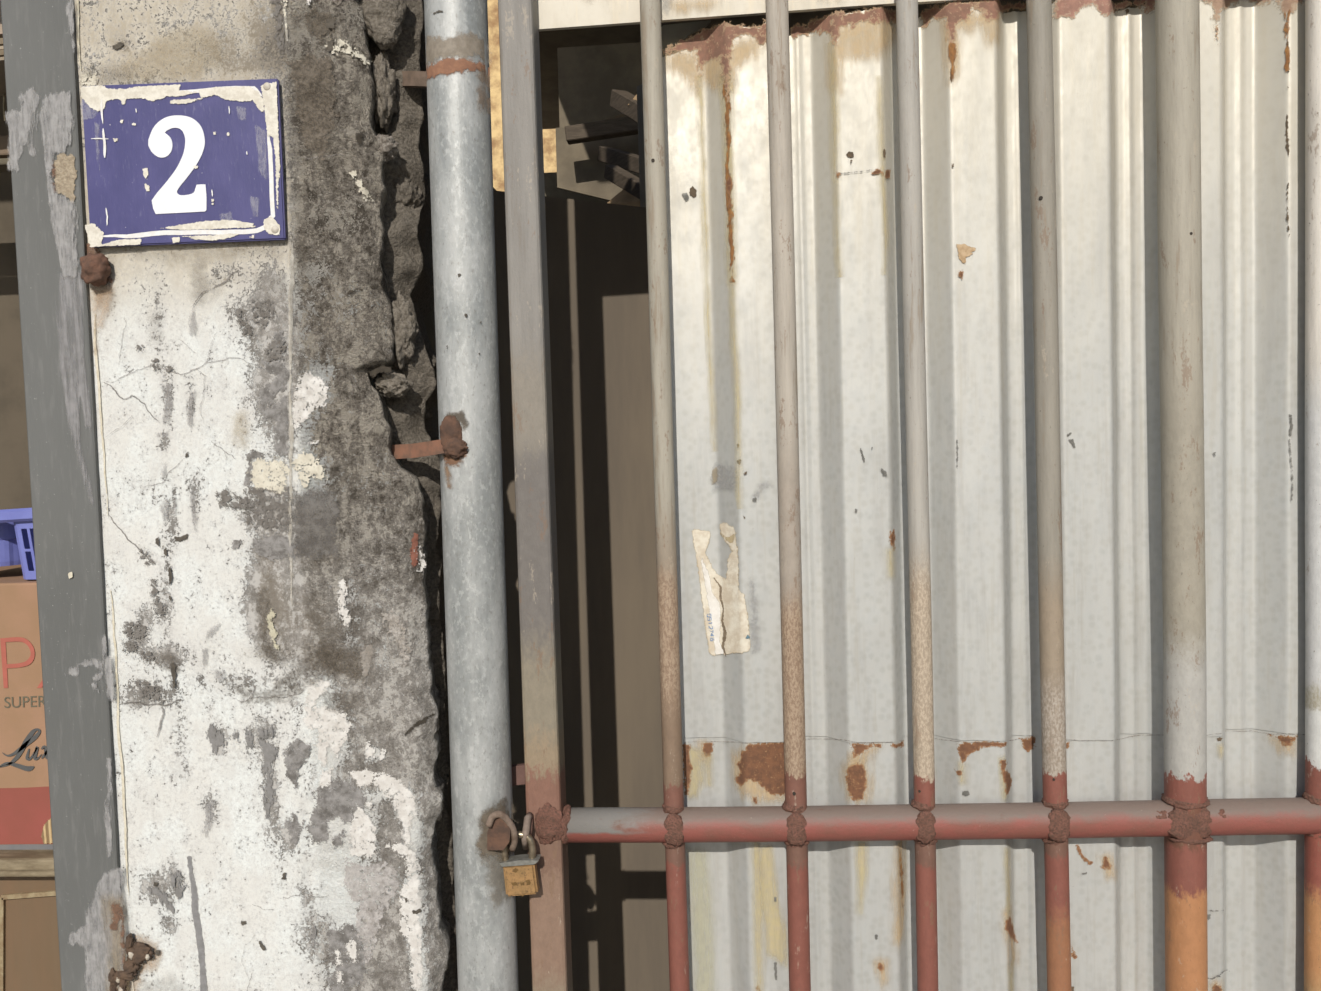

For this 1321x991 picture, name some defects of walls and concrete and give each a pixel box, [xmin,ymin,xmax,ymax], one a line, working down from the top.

rust [1052,0,1155,19]
rust [790,5,896,81]
rust [662,19,767,283]
peeling [155,534,188,556]
flaking render [410,533,426,572]
spalling [336,579,351,627]
spalling [382,610,412,667]
rust [734,742,785,804]
rust [845,740,904,801]
rust [956,736,1036,796]
peeling [205,679,426,991]
peeling [147,856,207,991]